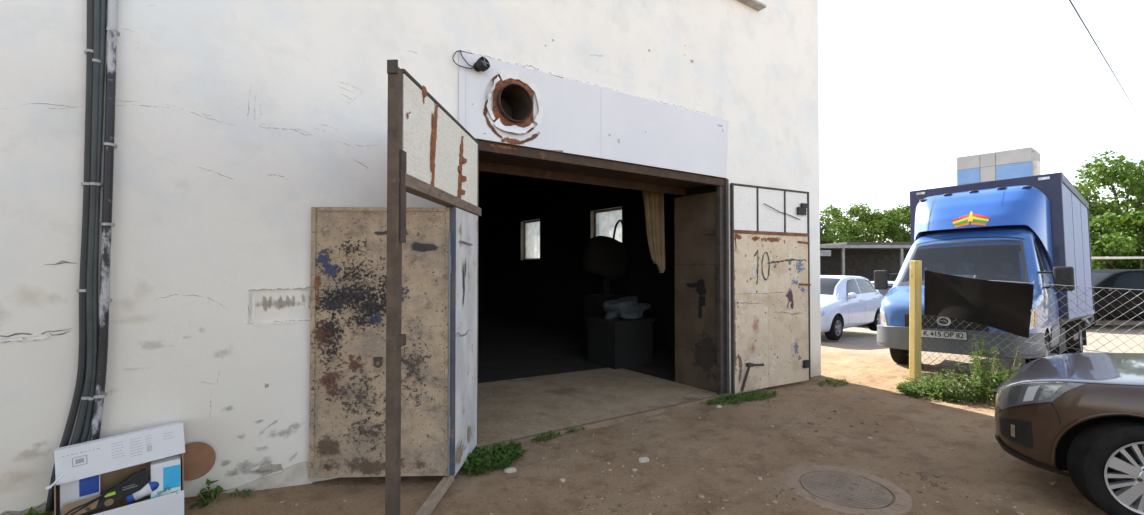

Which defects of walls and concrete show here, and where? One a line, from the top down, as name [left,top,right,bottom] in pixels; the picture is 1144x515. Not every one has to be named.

rust [422,85,438,186]
rust [483,97,540,150]
rust [457,136,467,199]